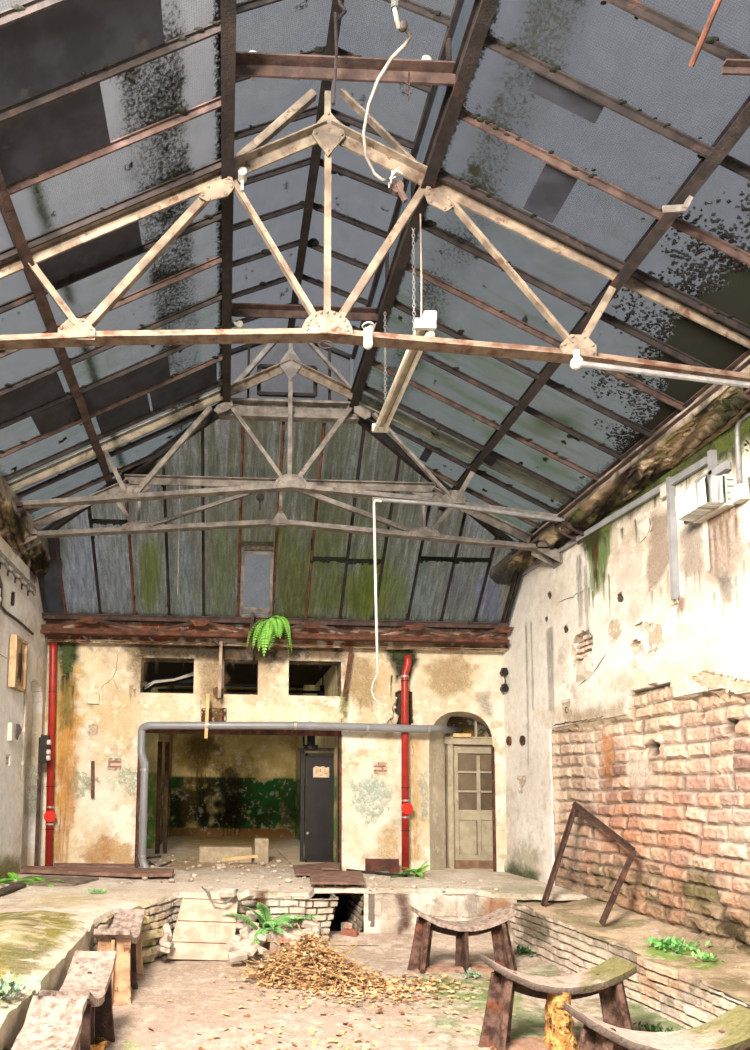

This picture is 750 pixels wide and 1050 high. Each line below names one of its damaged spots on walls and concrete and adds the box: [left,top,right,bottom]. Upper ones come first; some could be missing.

leakage [576,547,610,614]
leakage [647,515,669,593]
leakage [681,513,750,597]
flaking render [571,631,593,668]
flaking render [608,618,621,643]
flaking render [630,621,664,655]
leakage [56,673,77,852]
flaking render [551,671,750,956]